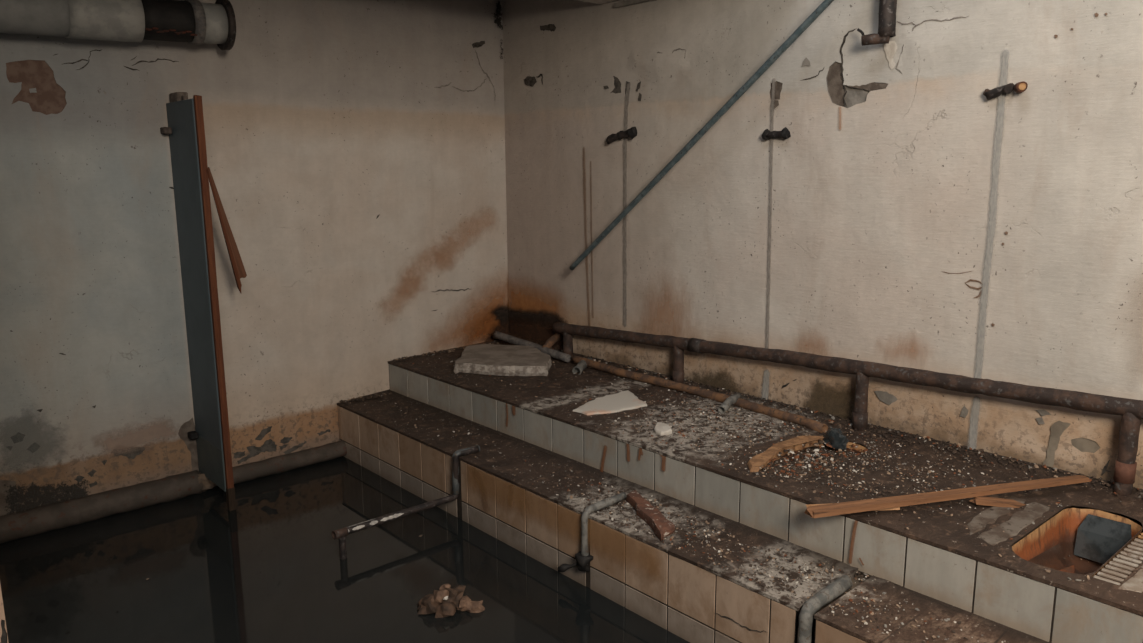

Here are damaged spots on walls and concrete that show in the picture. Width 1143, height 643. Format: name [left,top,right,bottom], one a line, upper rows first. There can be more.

crack [55,50,101,70]
crack [124,56,179,71]
crack [896,16,968,74]
peeling [6,60,67,115]
spalling [826,61,888,108]
peeling [234,426,330,464]
leakage [3,479,90,514]